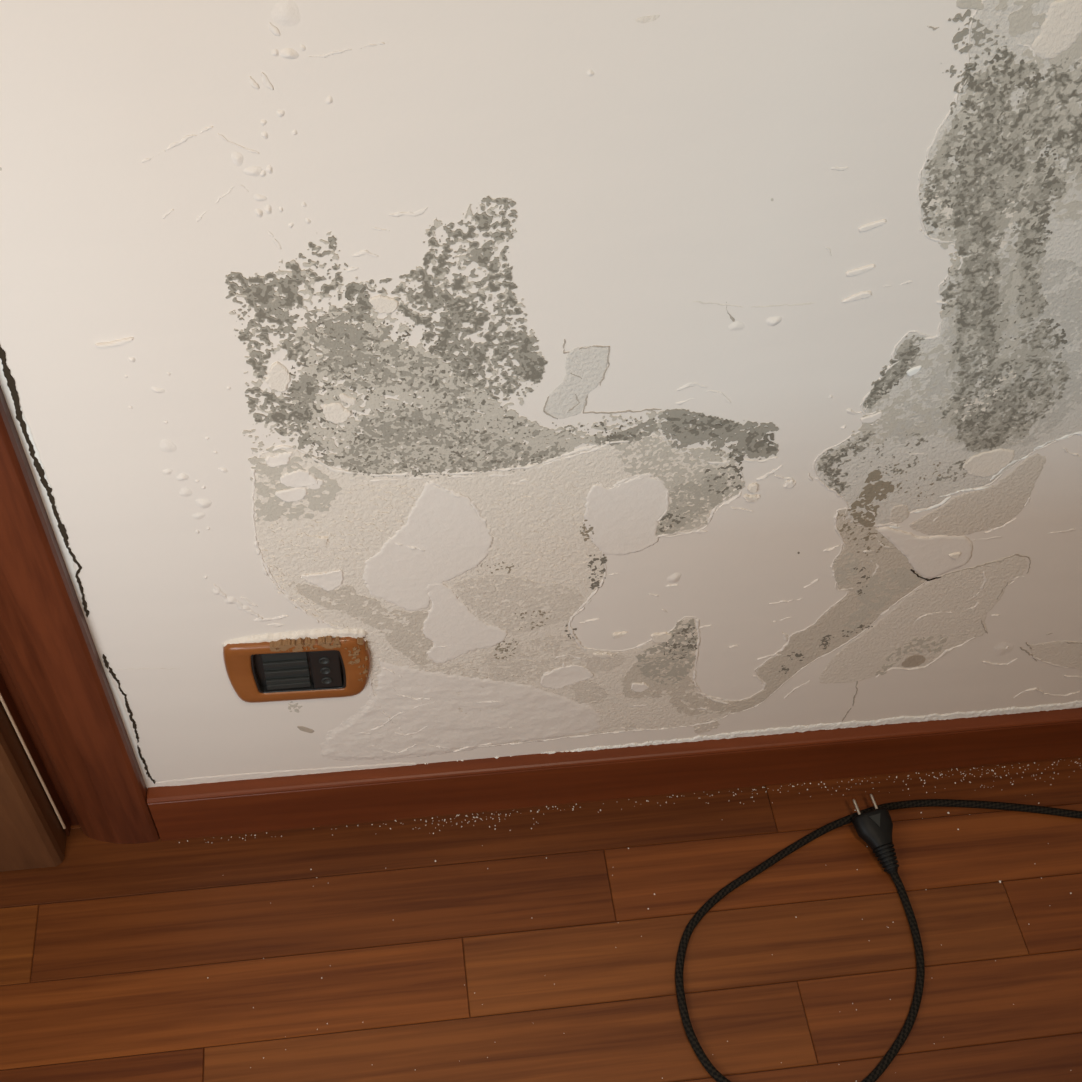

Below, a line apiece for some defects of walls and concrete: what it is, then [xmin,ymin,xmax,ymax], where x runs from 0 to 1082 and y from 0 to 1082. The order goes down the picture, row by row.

crack [0,347,89,617]
water stain [225,196,779,535]
flaking render [251,0,1082,761]
water stain [817,0,1082,649]
crack [102,654,155,784]